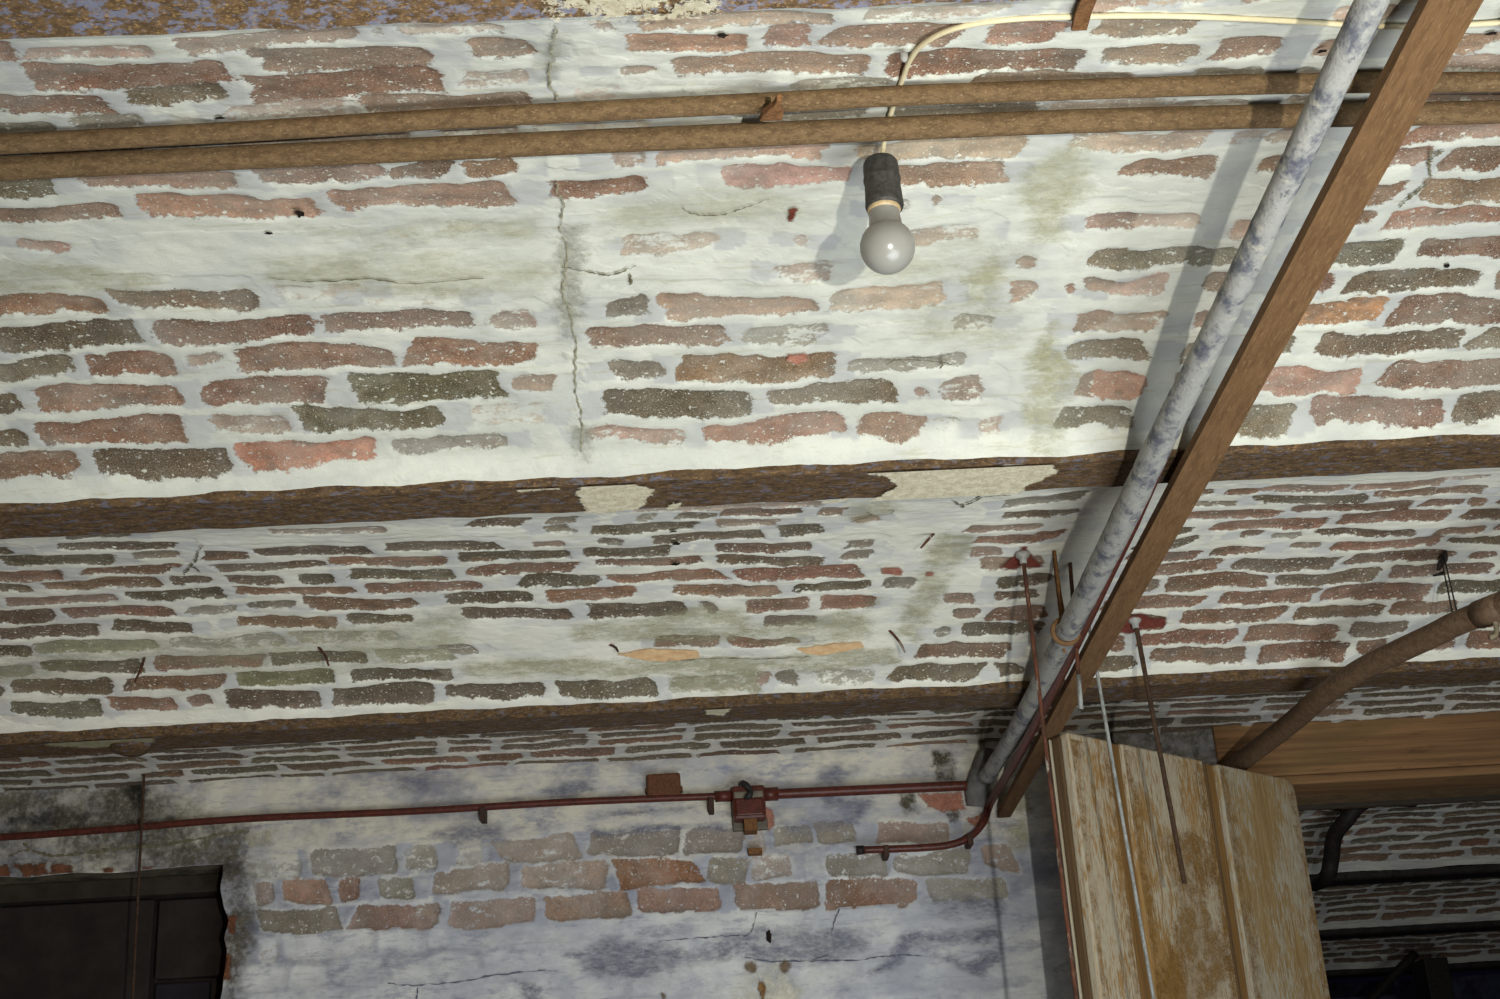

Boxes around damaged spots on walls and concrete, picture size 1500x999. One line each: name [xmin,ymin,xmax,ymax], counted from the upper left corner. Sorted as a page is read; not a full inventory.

crack [547,27,559,100]
crack [555,180,636,452]
damp [224,868,255,999]